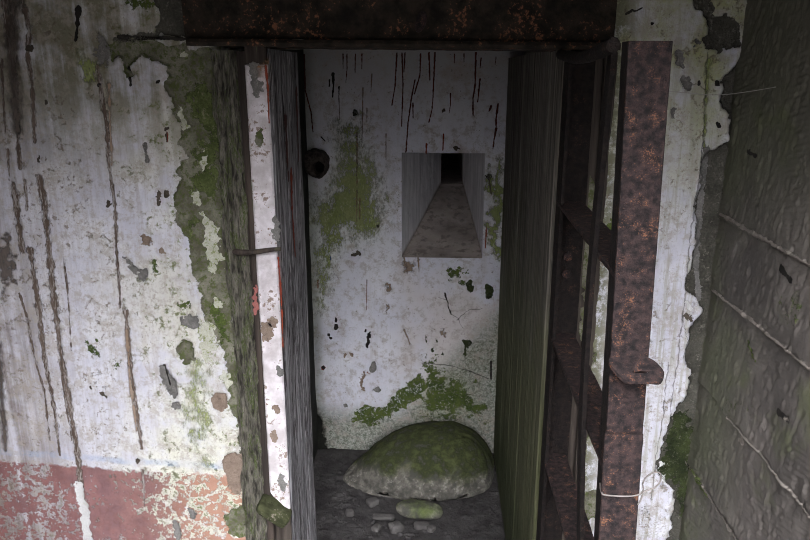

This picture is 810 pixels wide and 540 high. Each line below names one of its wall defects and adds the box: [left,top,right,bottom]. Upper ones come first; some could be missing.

flaking render [693,0,741,54]
corrosion [391,52,436,153]
corrosion [472,52,482,116]
flaking render [674,49,701,91]
flaking render [93,0,243,495]
flaking render [655,62,738,540]
flaking render [172,520,182,540]
flaking render [223,505,246,538]